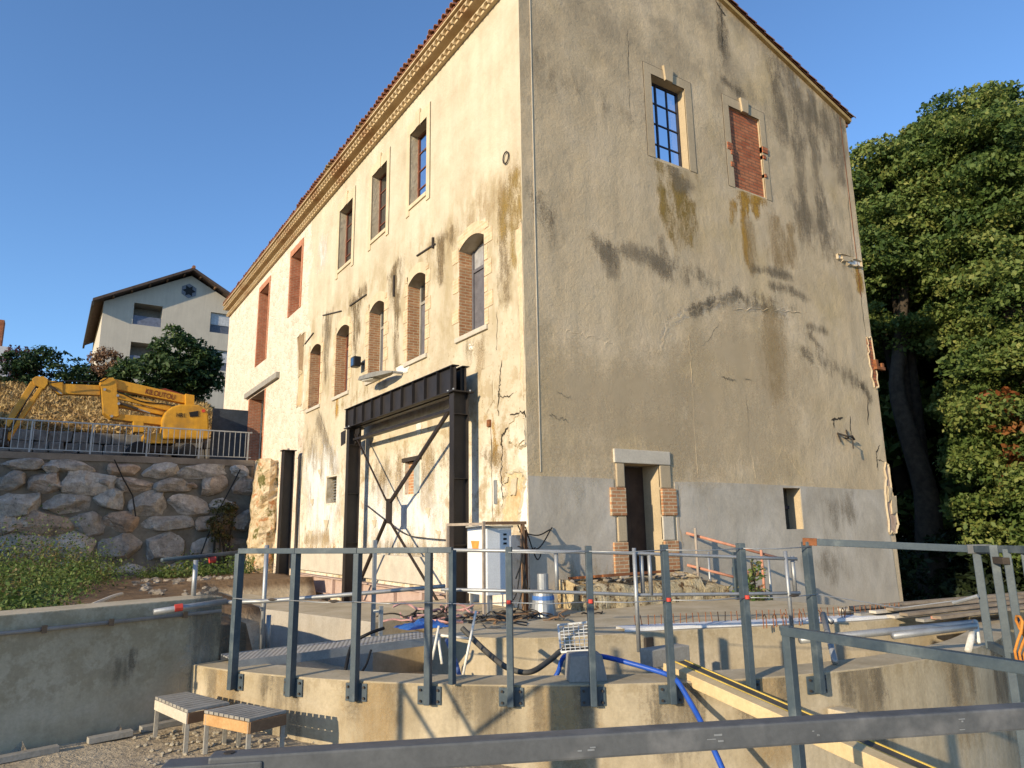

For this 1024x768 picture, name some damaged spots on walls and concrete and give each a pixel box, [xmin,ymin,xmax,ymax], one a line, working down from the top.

mould [483,169,522,298]
water stain [594,163,695,275]
water stain [678,71,845,390]
crack [490,315,571,515]
crack [832,401,869,431]
flaking render [866,336,879,389]
spalling [884,462,899,535]